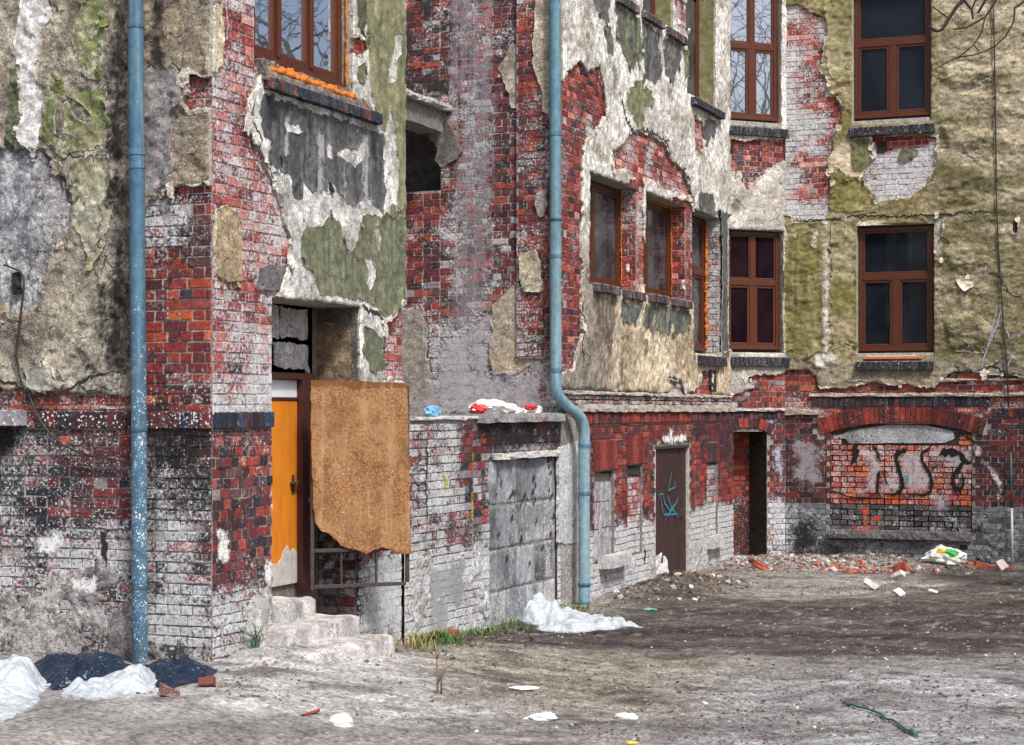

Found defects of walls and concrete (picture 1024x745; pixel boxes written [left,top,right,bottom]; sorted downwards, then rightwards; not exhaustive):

flaking render [0,0,117,323]
flaking render [145,0,611,428]
flaking render [593,0,731,401]
leakage [812,221,837,369]
flaking render [730,0,939,357]
flaking render [728,368,1024,418]